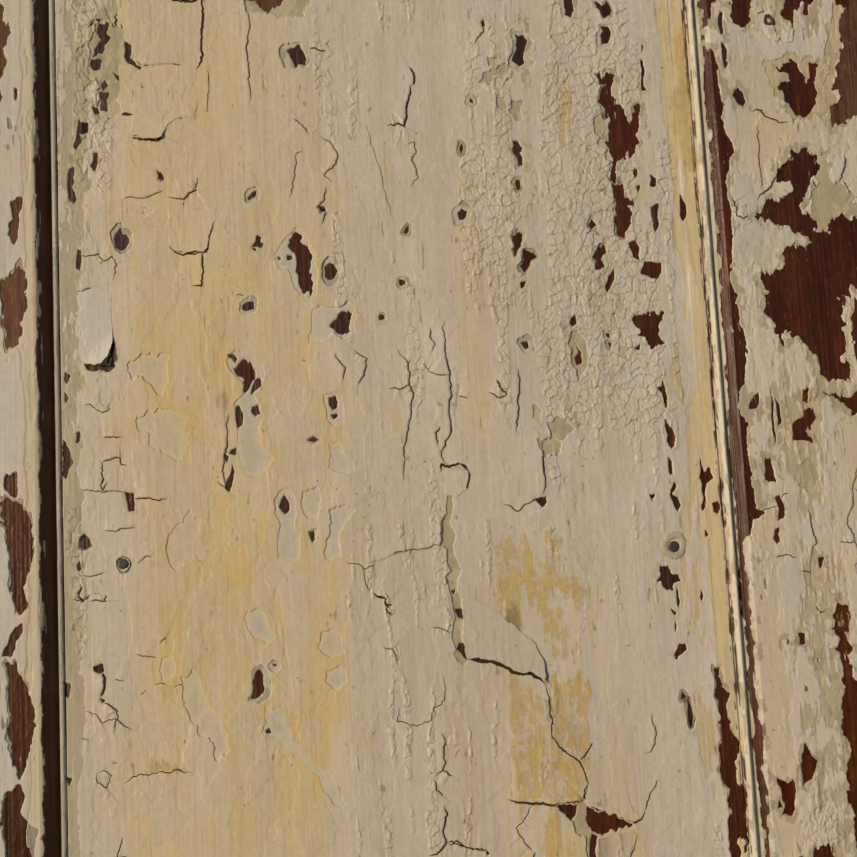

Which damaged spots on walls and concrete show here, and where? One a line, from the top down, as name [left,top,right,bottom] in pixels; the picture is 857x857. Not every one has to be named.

crack [389,67,418,186]
peeling [593,45,662,279]
peeling [0,258,28,353]
peeling [272,227,357,343]
peeling [216,350,274,492]
crack [390,325,471,489]
crack [490,371,521,432]
peeling [697,0,857,857]
peeling [0,472,39,857]
crack [430,743,490,856]
crack [468,658,601,857]
crack [622,780,658,857]